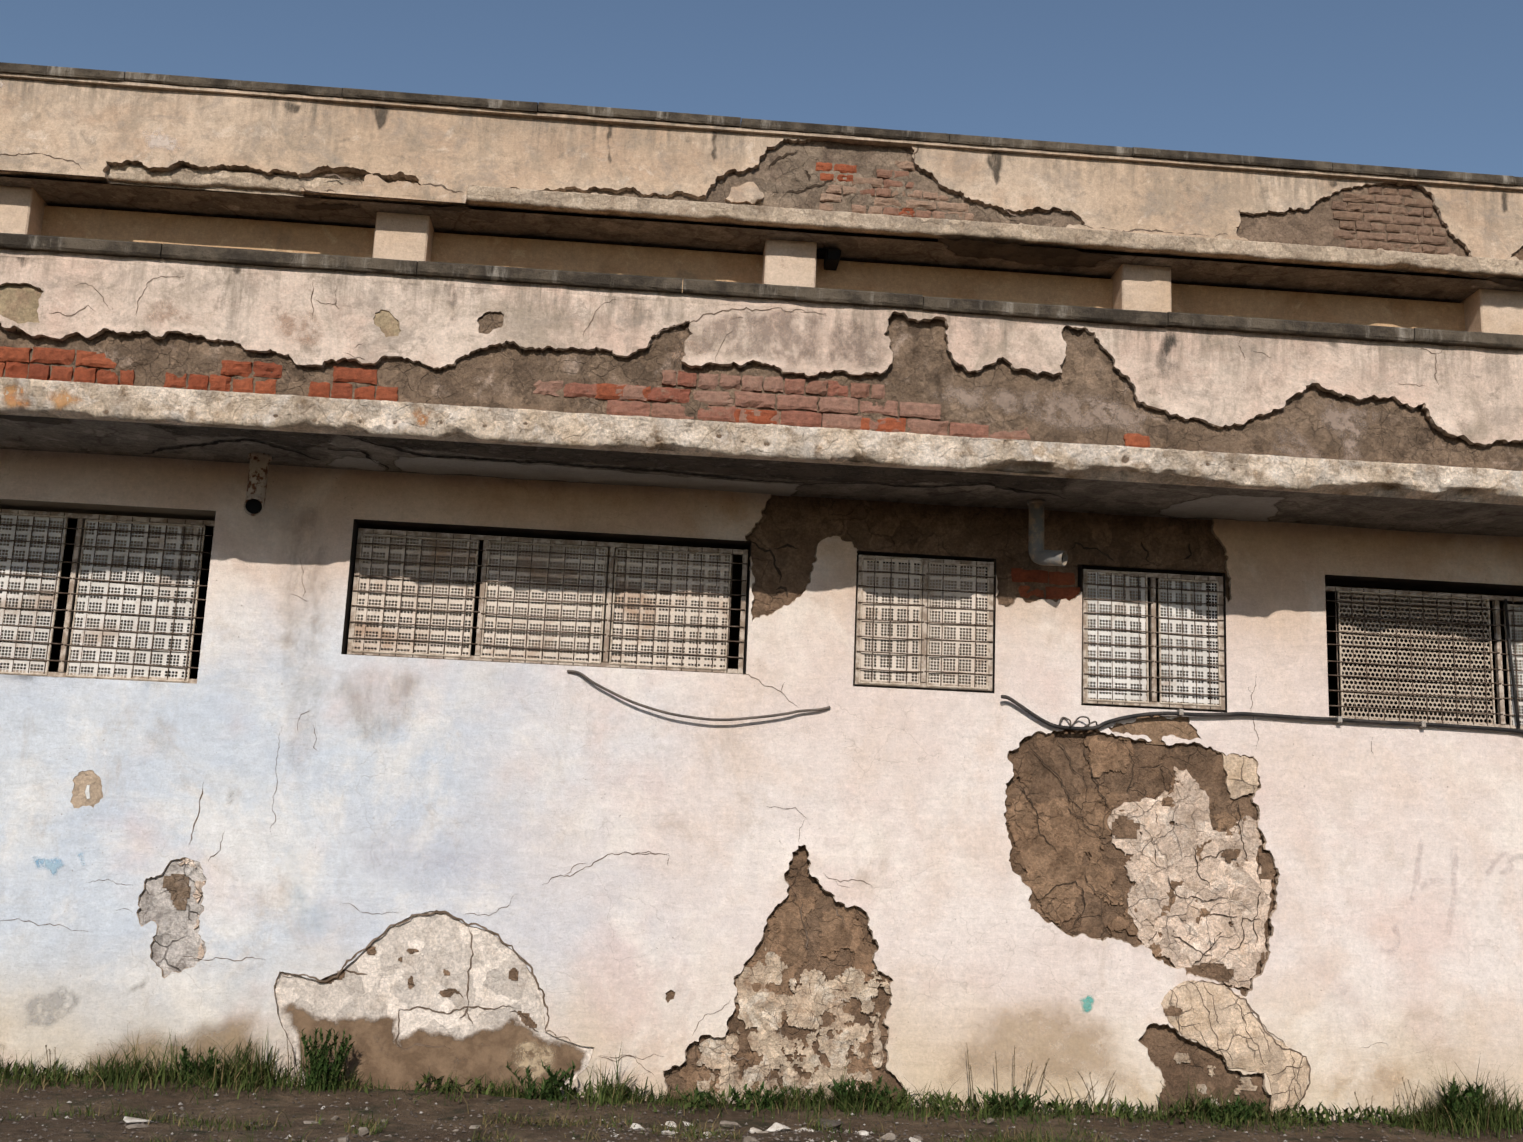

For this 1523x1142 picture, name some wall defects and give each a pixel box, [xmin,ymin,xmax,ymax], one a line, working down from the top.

flaking render [103,135,421,211]
flaking render [543,138,1118,267]
flaking render [1236,181,1523,288]
flaking render [0,282,1523,621]
peeling [70,770,103,808]
flaking render [136,857,207,979]
flaking render [274,910,595,1096]
crack [467,851,669,916]
flaking render [663,845,908,1106]
flaking render [1004,715,1280,997]
flaking render [1138,1023,1271,1117]